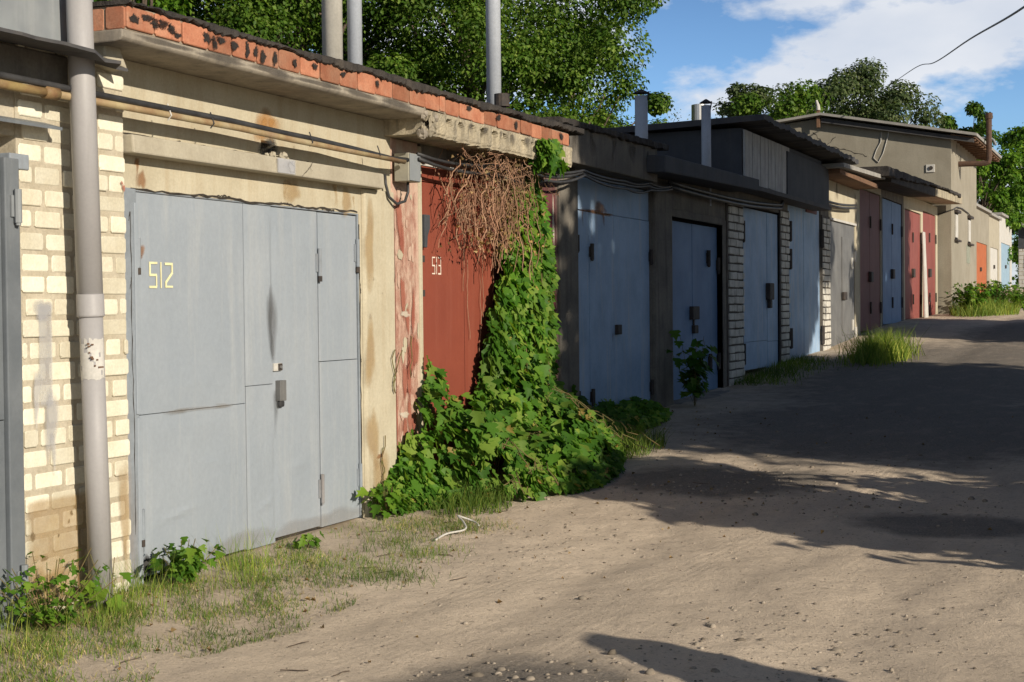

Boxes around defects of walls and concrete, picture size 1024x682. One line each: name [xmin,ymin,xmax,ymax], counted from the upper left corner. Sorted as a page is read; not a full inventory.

corrosion [258,113,276,137]
spalling [416,110,438,139]
peeling [394,185,419,451]